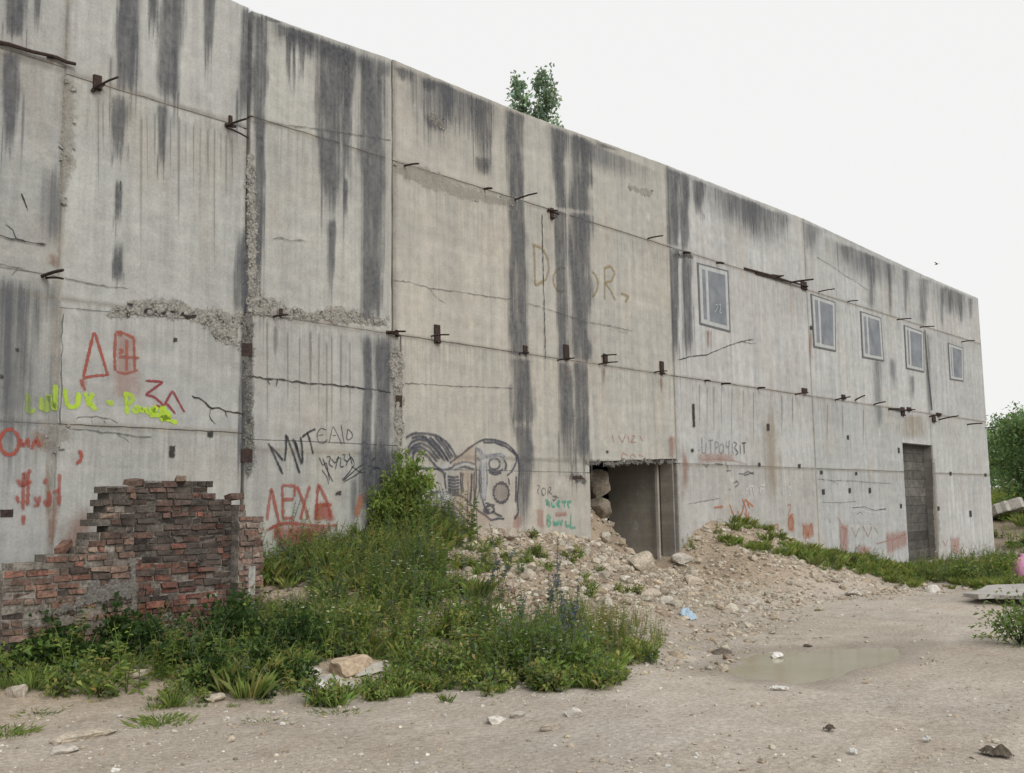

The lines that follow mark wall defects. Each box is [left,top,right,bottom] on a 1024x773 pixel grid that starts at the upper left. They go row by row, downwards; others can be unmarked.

water stain [3,53,24,138]
crack [0,193,46,245]
water stain [7,0,40,41]
crack [192,395,244,424]
spalling [107,153,390,476]
water stain [235,9,492,316]
water stain [353,338,393,510]
crack [248,376,513,393]
water stain [506,111,533,501]
water stain [553,129,622,480]
water stain [667,169,706,361]
crack [679,339,756,360]